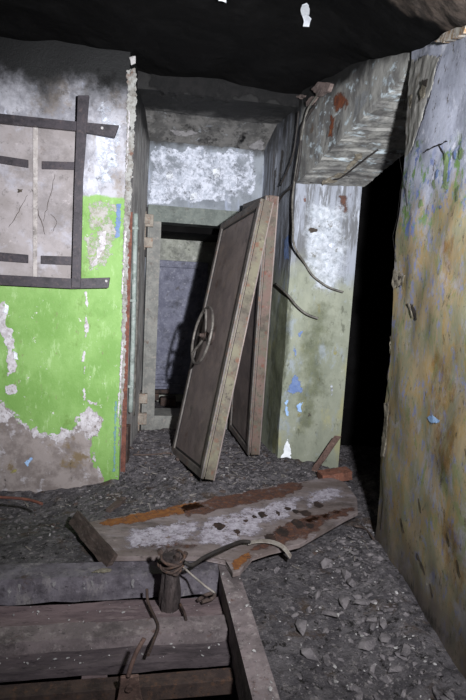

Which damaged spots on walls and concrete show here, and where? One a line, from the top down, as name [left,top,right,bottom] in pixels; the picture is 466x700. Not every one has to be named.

rust [328,92,348,137]
crack [10,177,57,231]
flaking render [83,56,137,477]
peeling [0,301,105,493]
peeling [284,375,303,416]